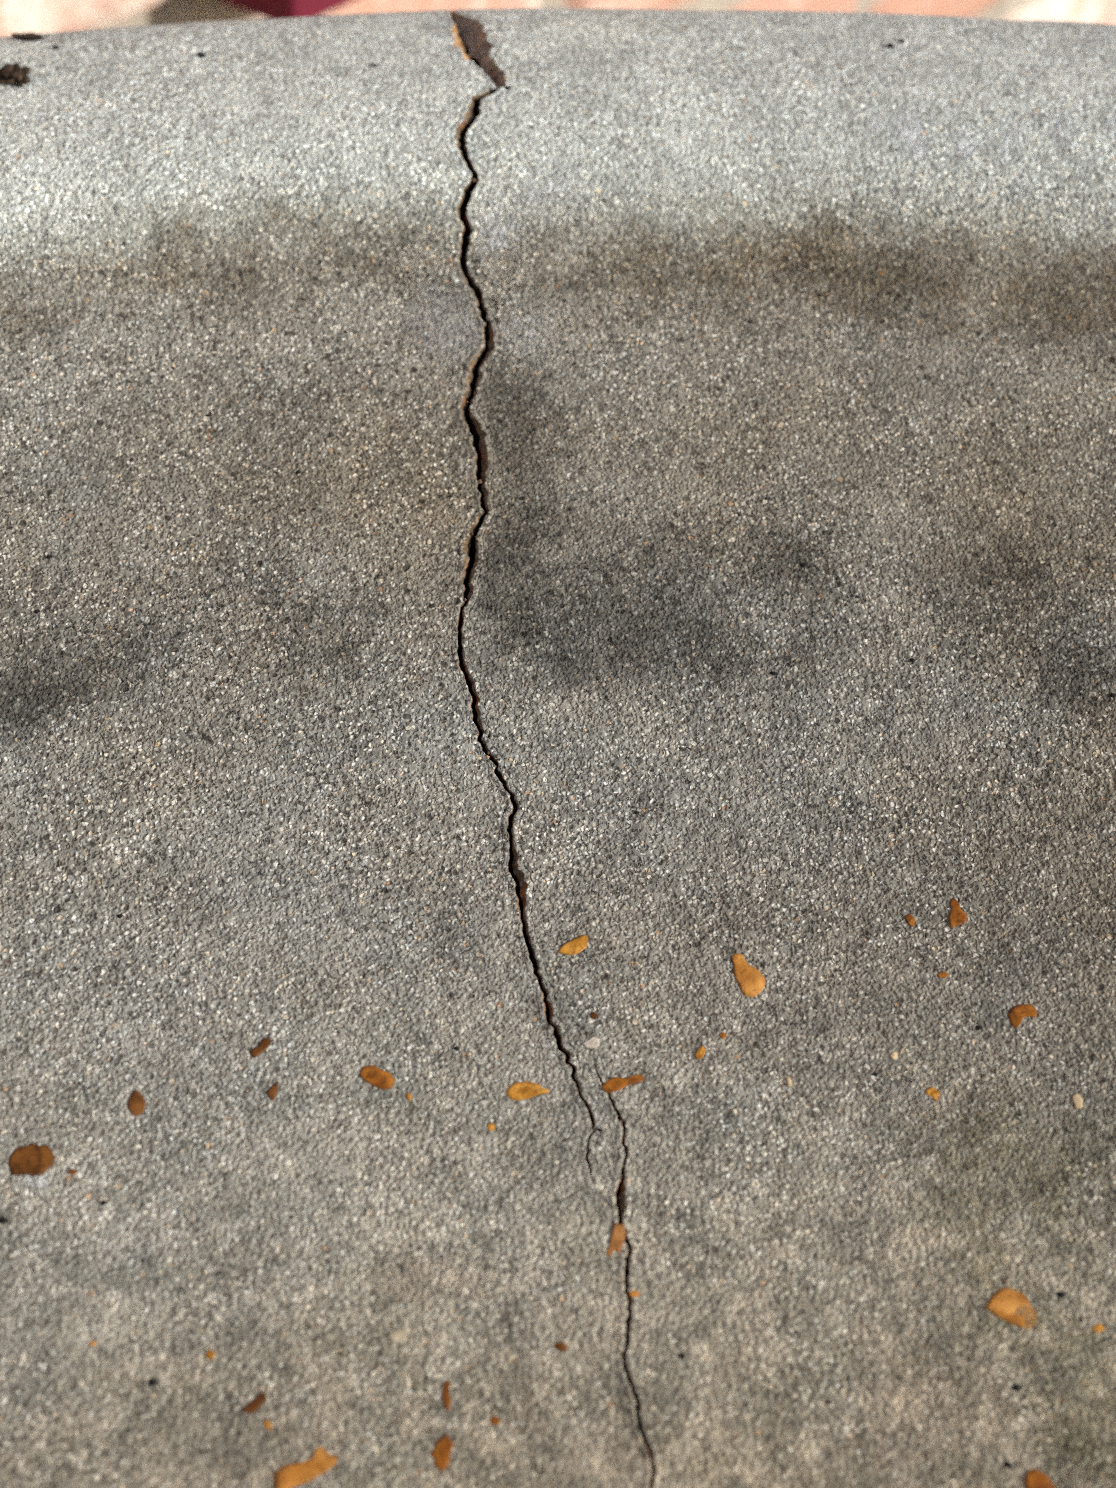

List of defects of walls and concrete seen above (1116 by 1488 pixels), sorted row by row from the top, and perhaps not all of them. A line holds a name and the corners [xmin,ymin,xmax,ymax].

crack [449,82,663,1488]